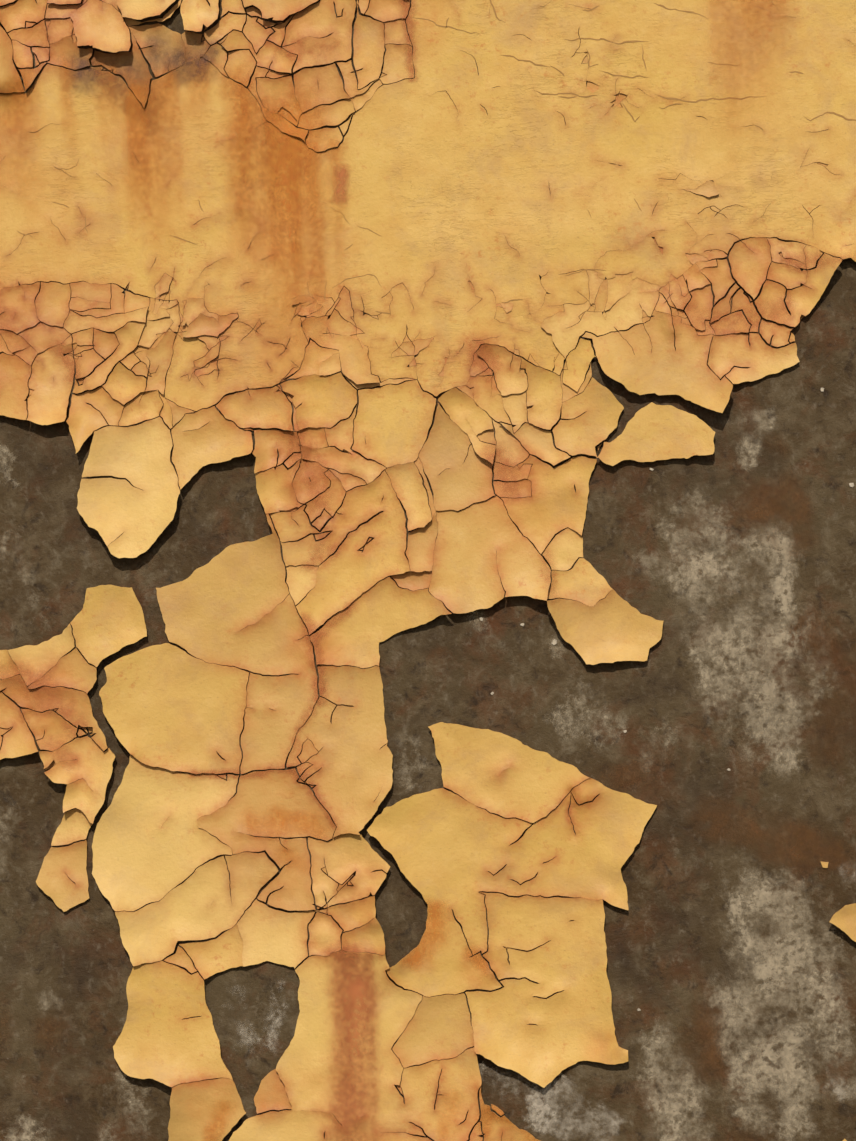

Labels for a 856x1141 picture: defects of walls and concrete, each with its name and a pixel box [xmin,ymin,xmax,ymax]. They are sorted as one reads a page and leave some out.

crack [413,0,504,34]
crack [654,3,706,18]
crack [503,38,764,122]
crack [805,112,856,121]
corrosion [270,103,315,254]
water stain [666,512,731,601]
peeling [0,238,842,1141]
water stain [690,527,800,769]
peeling [829,903,856,942]
water stain [712,876,849,1135]
water stain [527,1079,570,1133]
water stain [642,1037,700,1141]